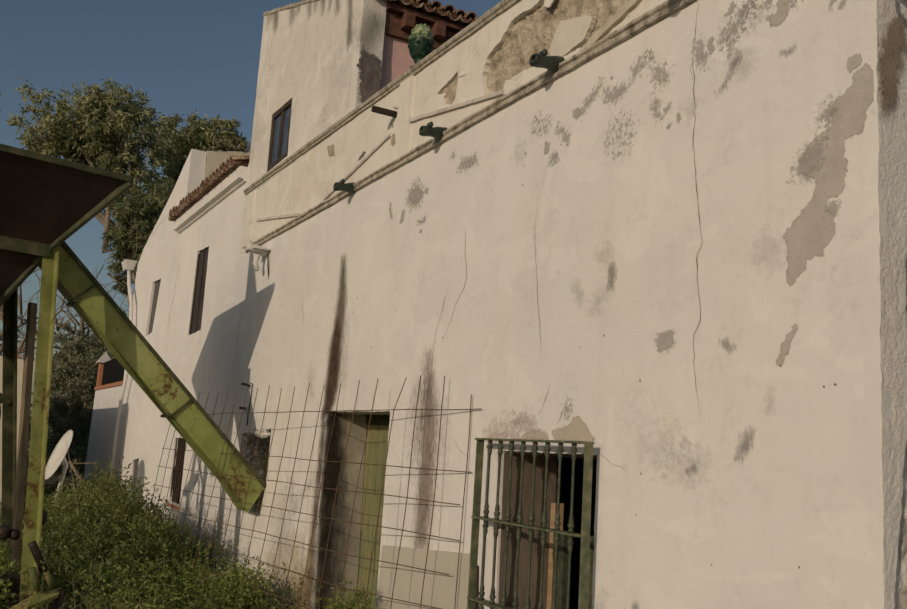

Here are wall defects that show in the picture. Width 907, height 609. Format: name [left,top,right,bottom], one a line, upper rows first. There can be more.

spalling [486,0,629,93]
peeling [782,14,907,285]
peeling [776,324,798,367]
leakage [270,257,348,609]
peeling [489,399,594,445]